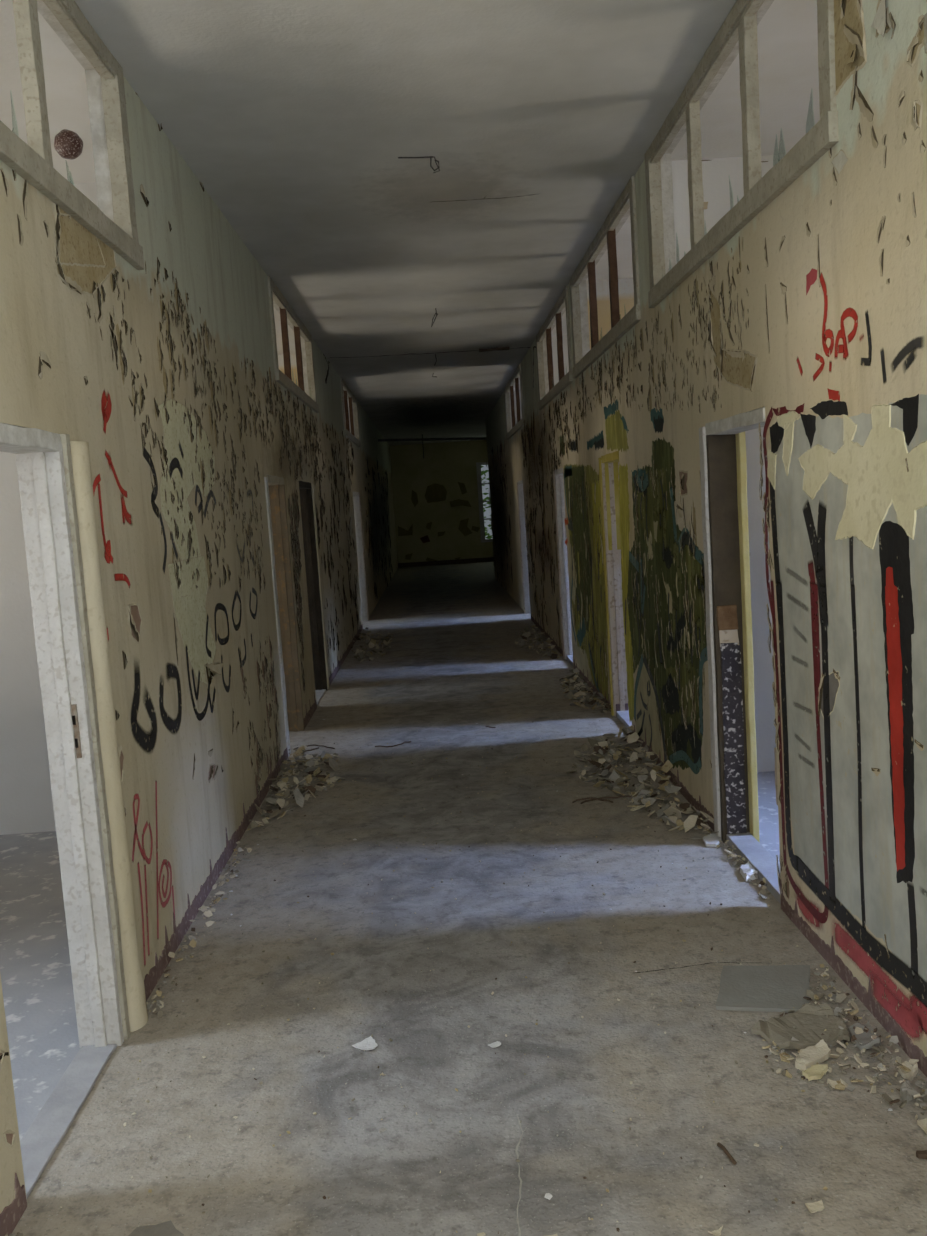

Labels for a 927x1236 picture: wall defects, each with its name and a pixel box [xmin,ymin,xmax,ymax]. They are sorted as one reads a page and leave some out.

peeling [834,0,896,168]
peeling [898,91,926,153]
peeling [906,15,924,82]
peeling [1,168,29,245]
peeling [877,216,890,284]
peeling [38,351,51,379]
peeling [43,203,359,693]
peeling [398,235,788,648]
peeling [759,404,927,573]
peeling [632,460,706,758]
peeling [232,637,281,794]
peeling [818,669,841,717]